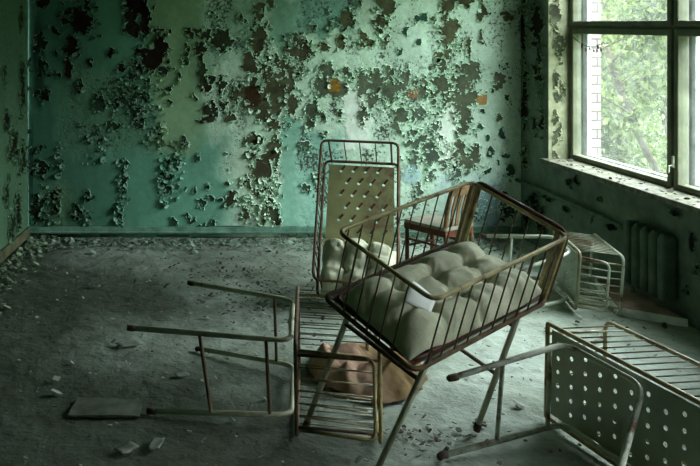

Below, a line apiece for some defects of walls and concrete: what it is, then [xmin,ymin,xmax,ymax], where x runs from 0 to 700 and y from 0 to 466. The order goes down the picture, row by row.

peeling [2,0,573,245]